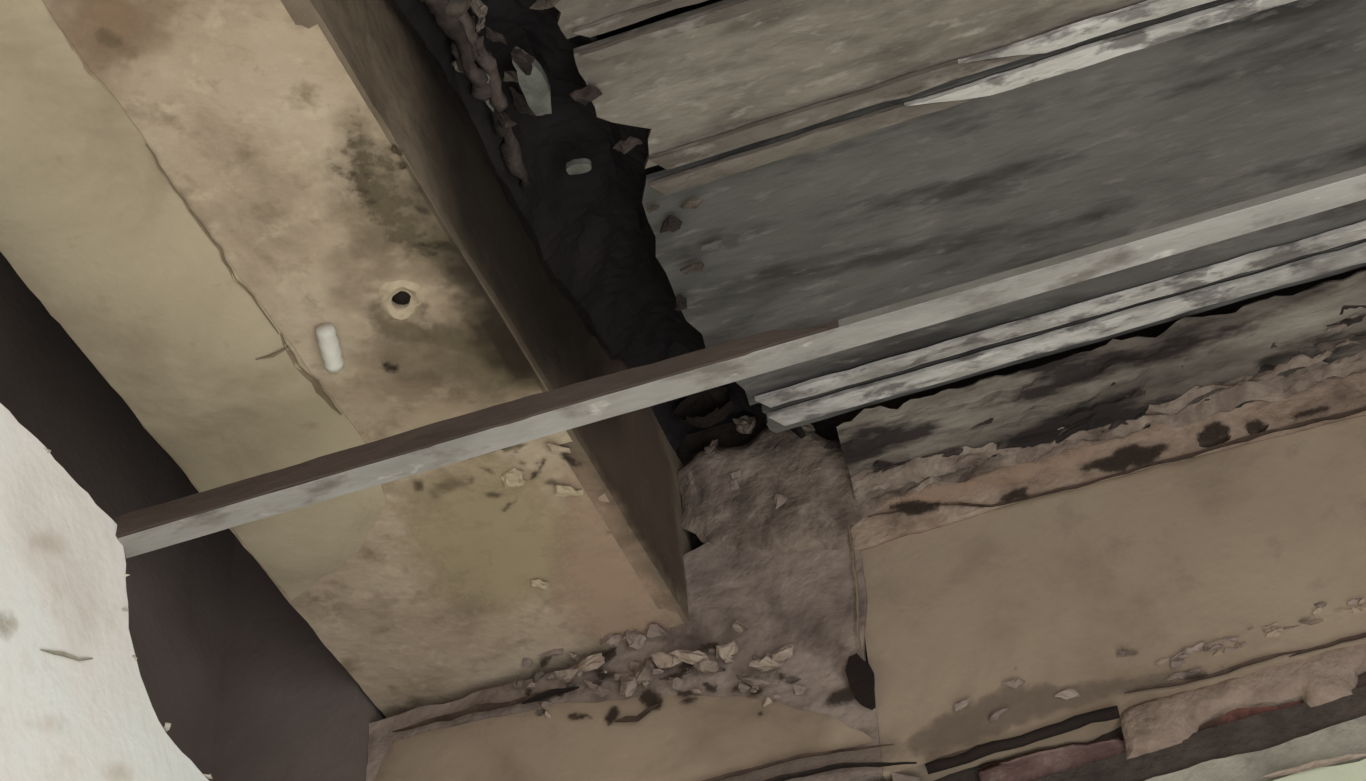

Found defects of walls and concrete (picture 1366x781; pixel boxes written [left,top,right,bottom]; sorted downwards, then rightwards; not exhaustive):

spalling [393,0,722,369]
crack [145,144,342,415]
flaking render [651,270,1366,553]
flaking render [1262,598,1366,638]
flaking render [1156,637,1247,682]
flaking render [1356,672,1366,688]
flaking render [925,688,1126,781]
flaking render [1198,701,1304,732]
peeling [1263,754,1366,778]